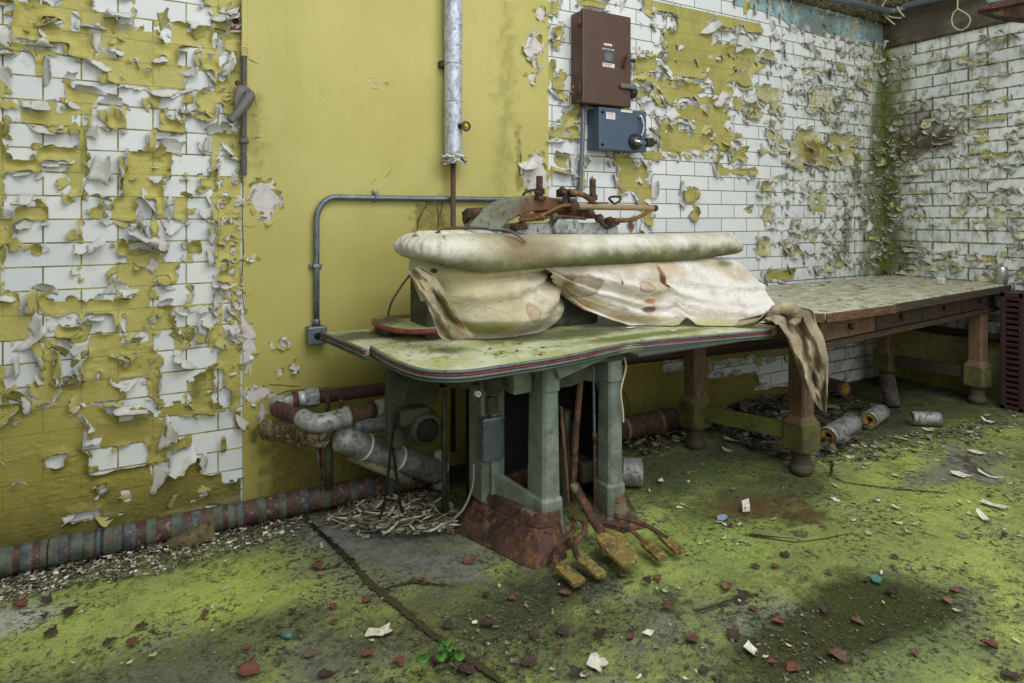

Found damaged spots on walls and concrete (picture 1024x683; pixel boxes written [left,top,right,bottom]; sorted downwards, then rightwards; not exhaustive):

peeling [517,0,594,196]
peeling [576,0,1024,290]
peeling [0,0,300,547]
peeling [621,359,684,417]
peeling [706,338,789,408]